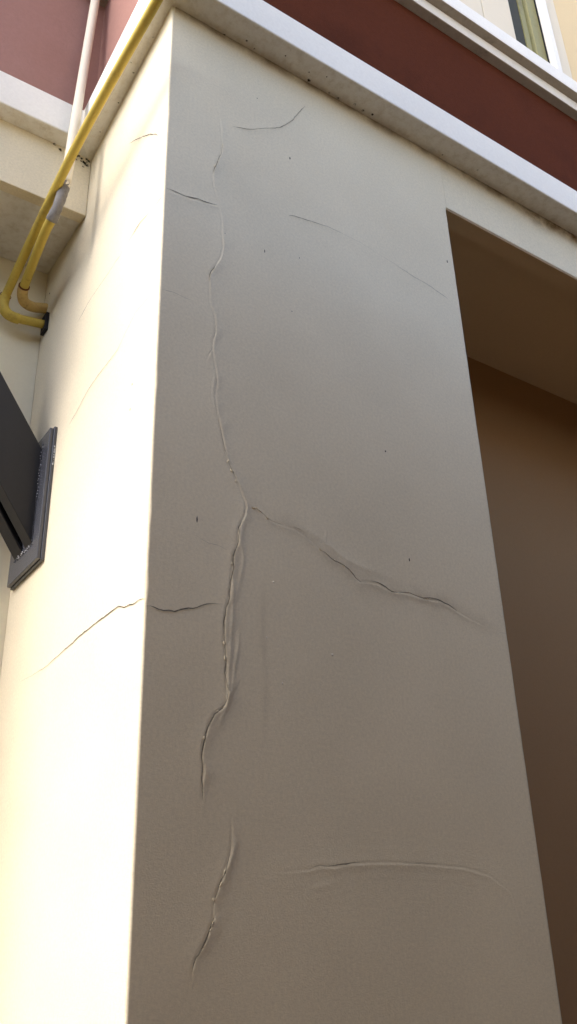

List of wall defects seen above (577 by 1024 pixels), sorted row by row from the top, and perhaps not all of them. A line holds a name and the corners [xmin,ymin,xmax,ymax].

crack [132,178,220,235]
crack [252,495,507,650]
crack [44,598,213,668]